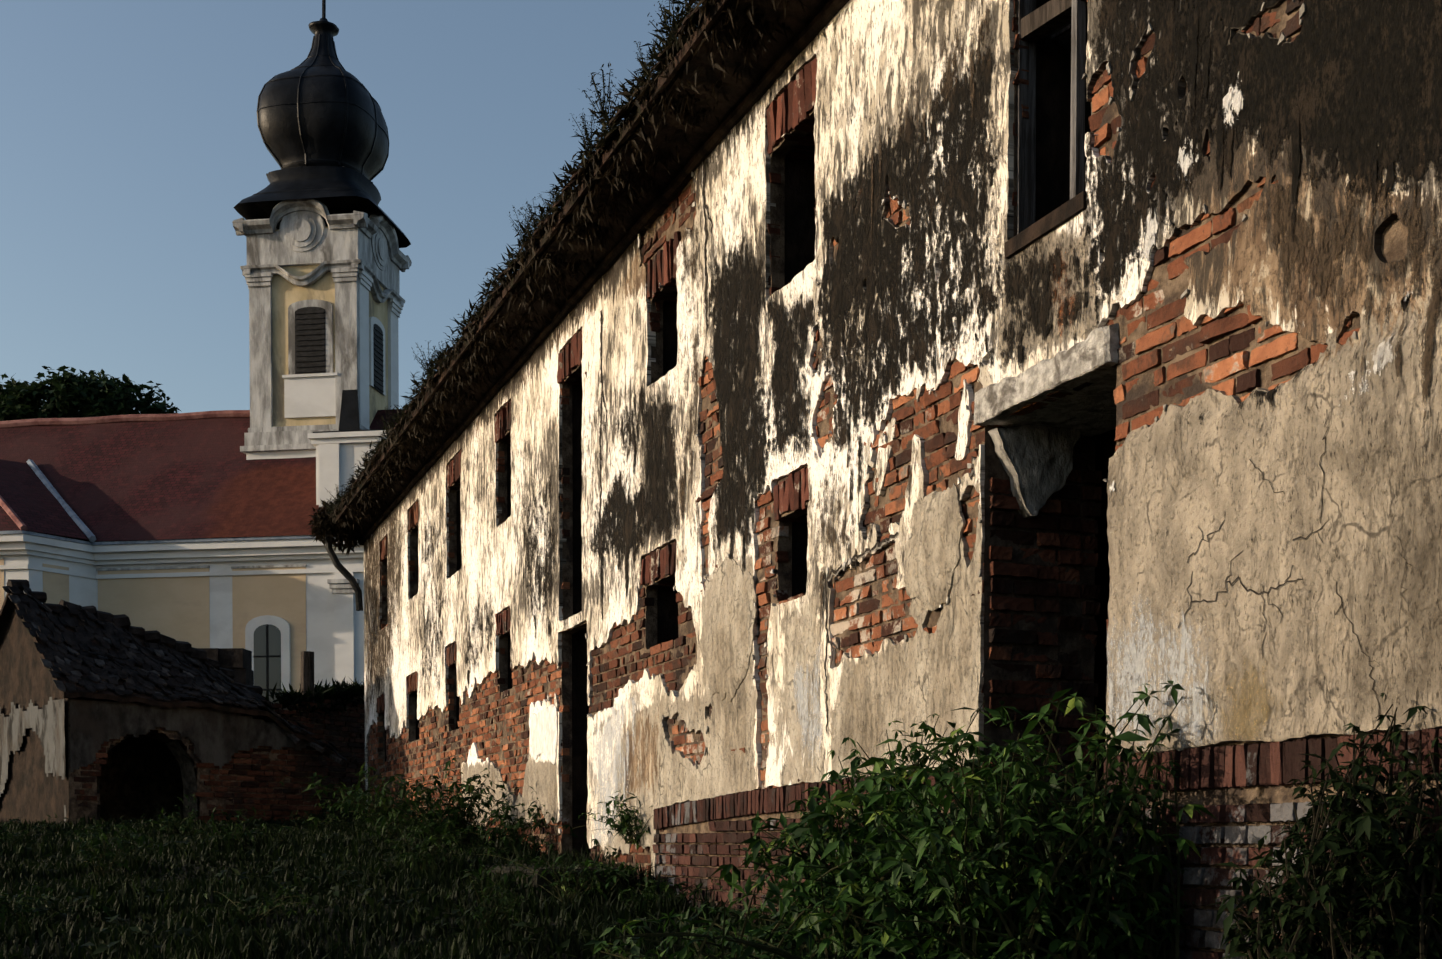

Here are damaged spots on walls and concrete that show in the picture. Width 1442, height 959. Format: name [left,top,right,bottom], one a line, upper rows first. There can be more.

flaking render [1082,23,1156,161]
flaking render [1233,0,1306,45]
water stain [589,0,1442,633]
flaking render [1103,177,1360,452]
flaking render [552,388,570,429]
flaking render [561,357,724,718]
flaking render [826,347,1098,663]
crack [1178,409,1382,718]
flaking render [367,648,569,820]
flaking render [661,707,712,769]
water stain [794,650,823,763]
water stain [1106,604,1269,746]